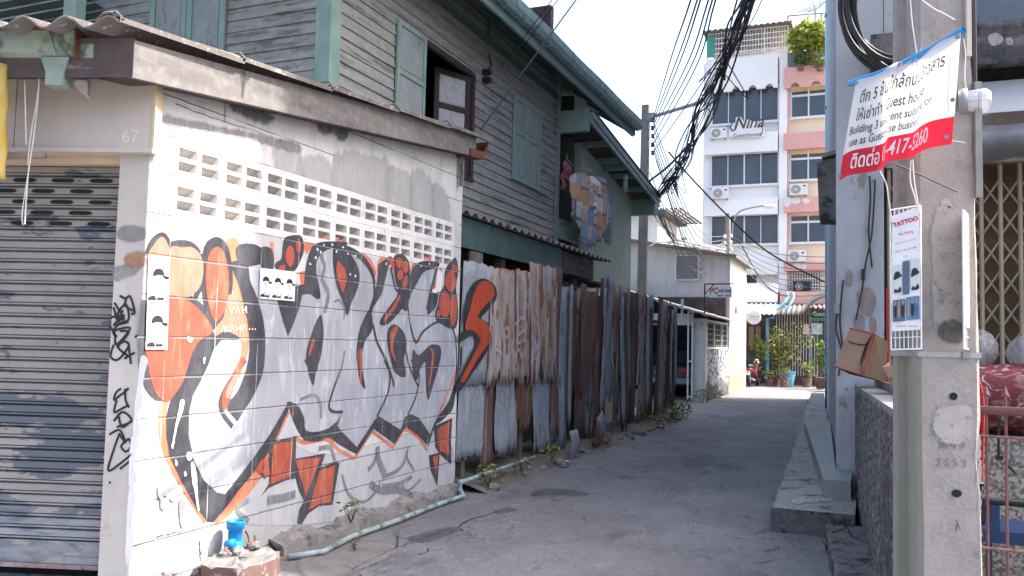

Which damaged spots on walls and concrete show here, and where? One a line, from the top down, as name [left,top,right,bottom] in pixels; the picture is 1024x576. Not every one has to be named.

leakage [162,72,450,221]